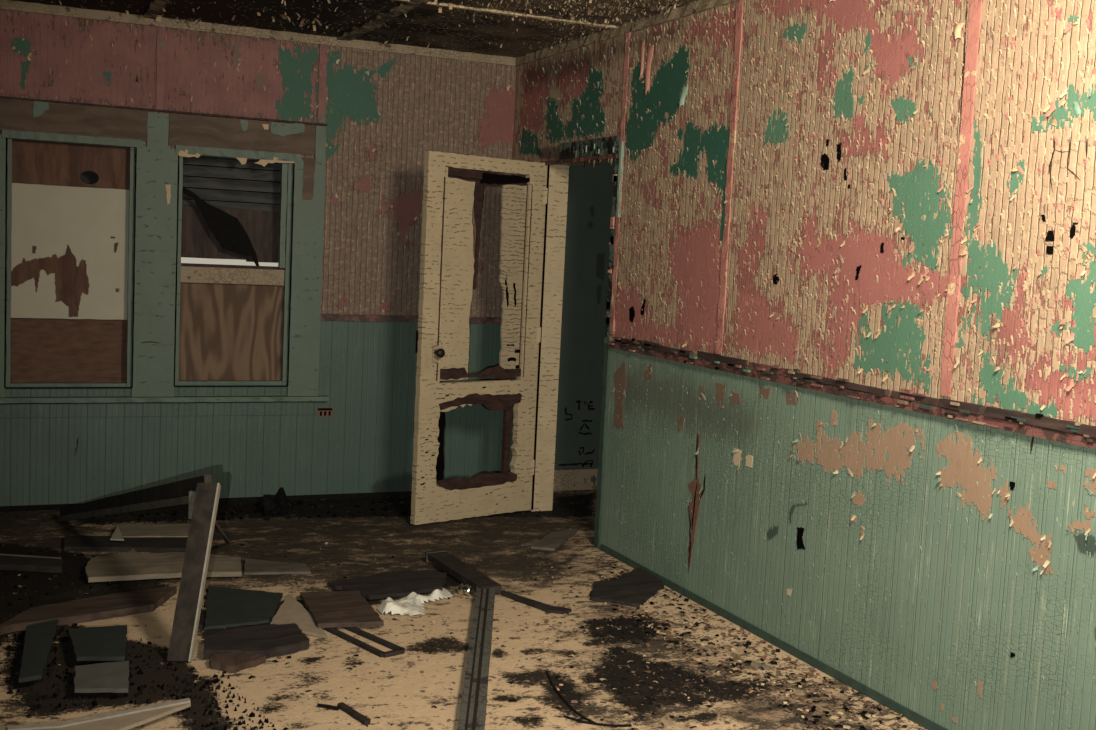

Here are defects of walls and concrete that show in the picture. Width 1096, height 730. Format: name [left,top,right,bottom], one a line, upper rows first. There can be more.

peeling [220,0,376,33]
peeling [275,44,396,159]
peeling [391,0,699,57]
peeling [520,65,605,157]
peeling [762,109,790,150]
peeling [759,0,918,126]
peeling [1026,84,1096,133]
peeling [11,245,89,317]
peeling [608,44,730,429]
peeling [714,294,823,405]
peeling [789,119,1096,575]
peeling [732,448,753,470]